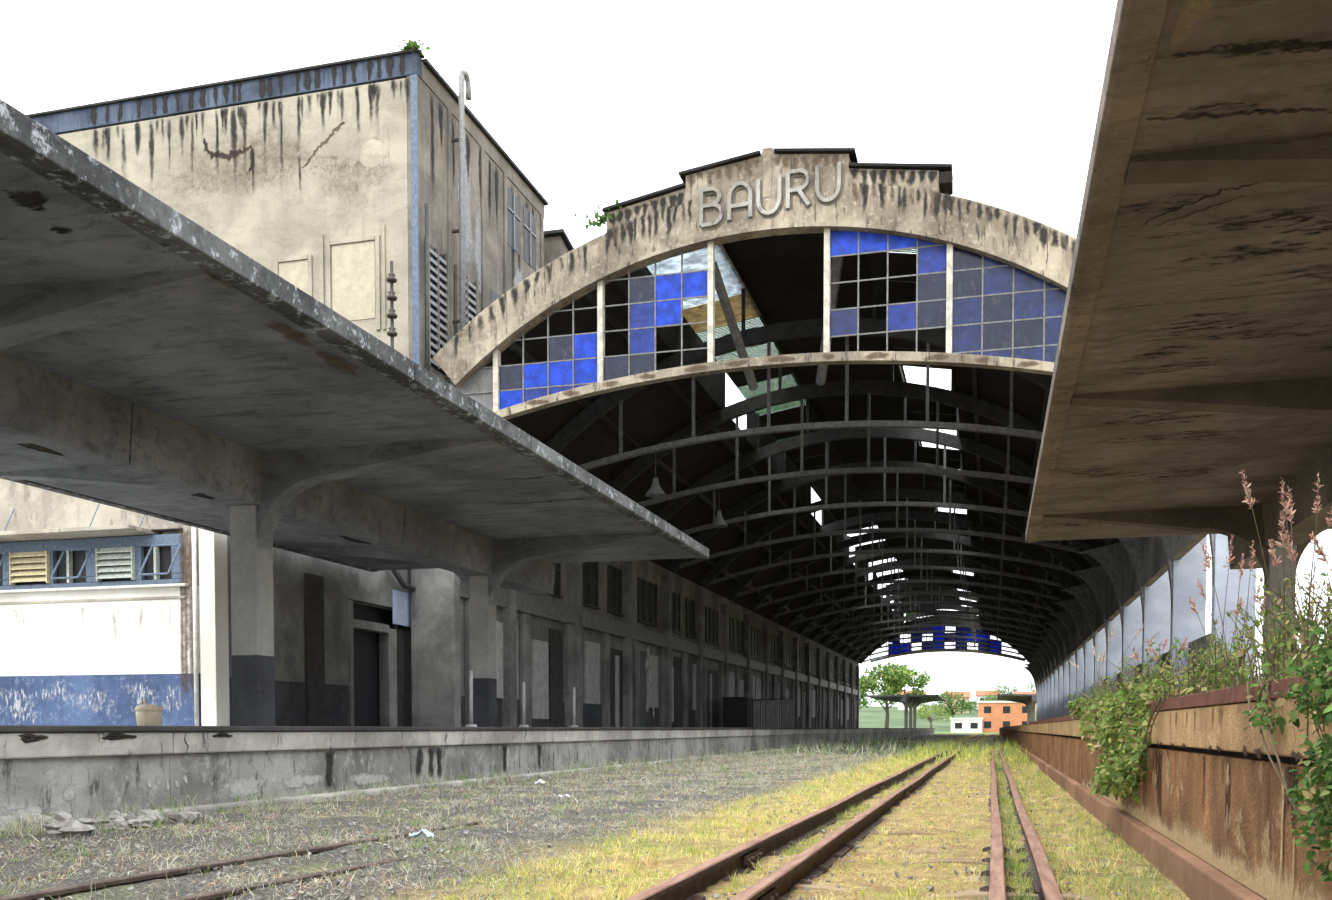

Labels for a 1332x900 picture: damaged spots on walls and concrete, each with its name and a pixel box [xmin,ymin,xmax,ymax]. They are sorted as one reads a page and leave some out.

crack [1163,39,1332,58]
water stain [90,55,409,186]
crack [1146,103,1327,121]
crack [203,138,255,172]
crack [302,122,345,168]
crack [1141,182,1260,226]
peeling [0,681,114,743]
peeling [128,684,181,709]
spalling [102,733,137,741]
water stain [1082,781,1325,900]